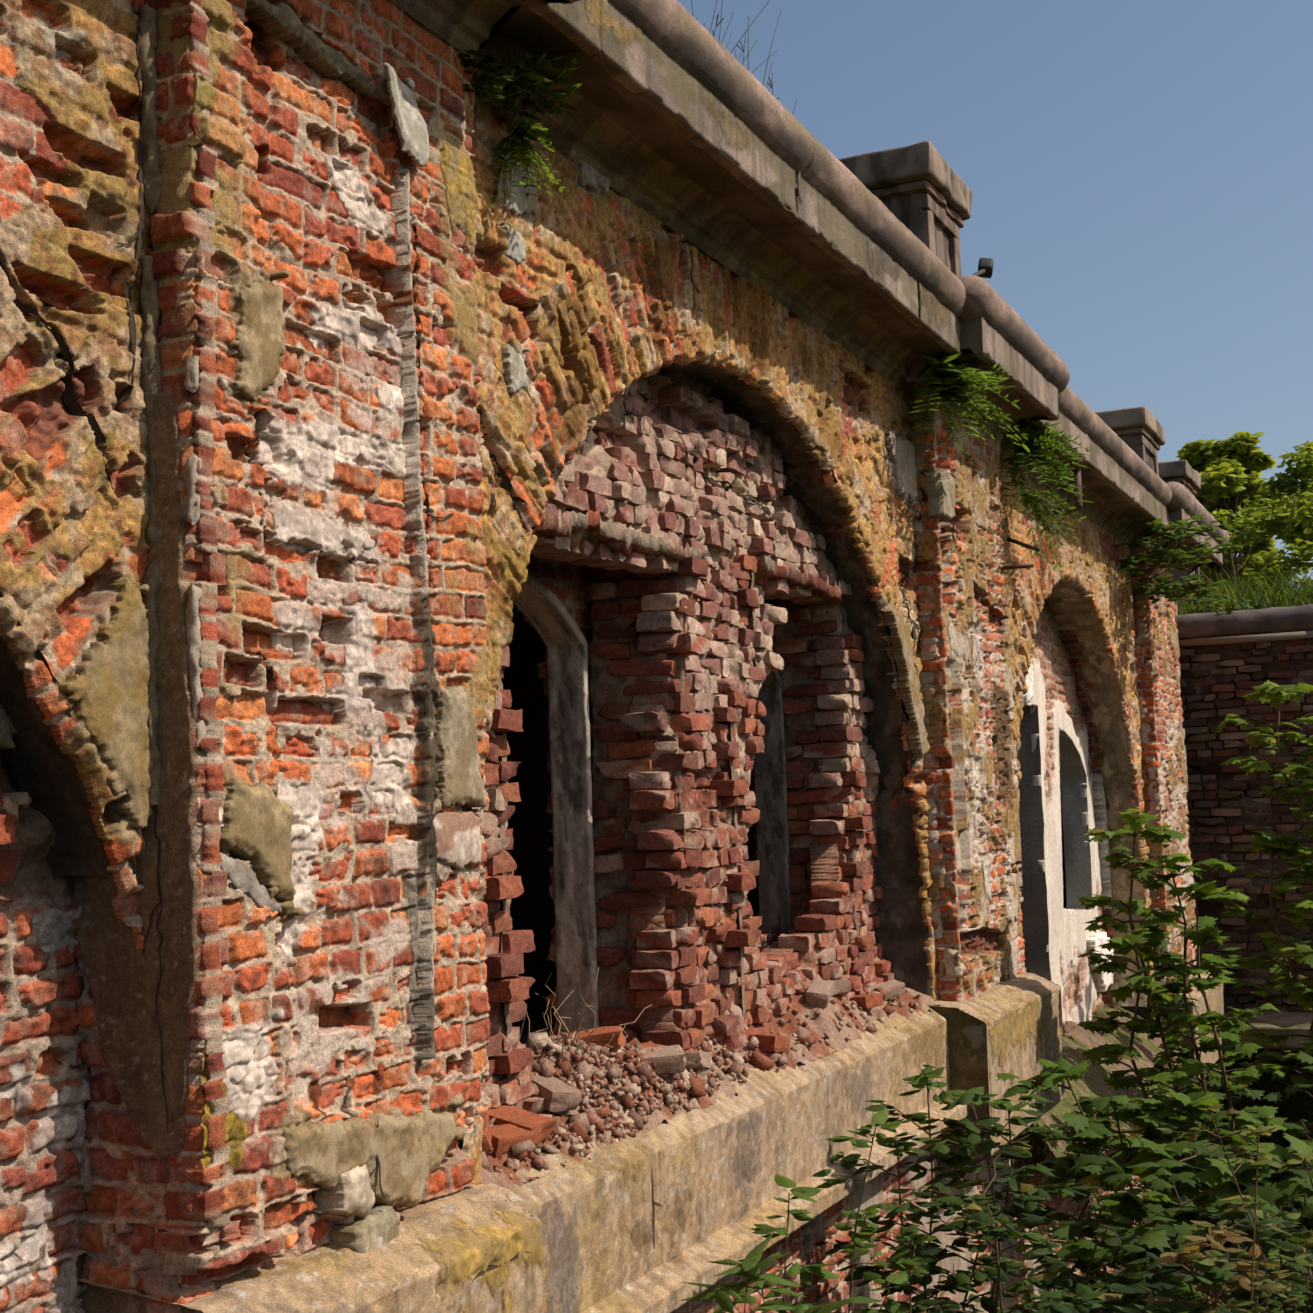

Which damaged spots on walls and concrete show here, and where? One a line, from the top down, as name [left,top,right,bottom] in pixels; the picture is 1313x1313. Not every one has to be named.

flaking render [245,0,430,167]
crack [0,0,144,493]
peeling [224,409,420,501]
damp [542,274,607,483]
damp [636,239,681,369]
peeling [243,587,483,870]
damp [0,1063,91,1163]
crack [143,805,168,1133]
peeling [222,1008,284,1119]
peeling [267,778,323,972]
damp [403,593,442,1071]
damp [0,1189,88,1313]